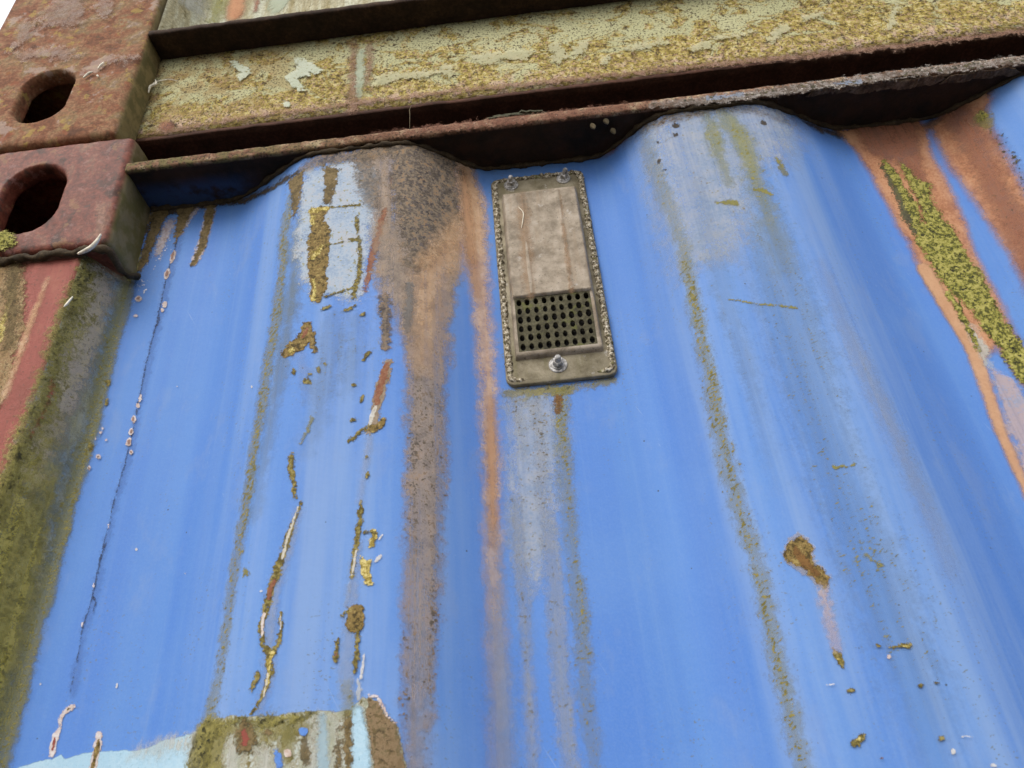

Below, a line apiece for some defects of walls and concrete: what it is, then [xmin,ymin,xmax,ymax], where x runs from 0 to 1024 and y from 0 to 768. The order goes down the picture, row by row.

peeling [230,60,252,81]
peeling [284,57,323,91]
peeling [371,63,459,87]
peeling [471,36,593,65]
peeling [651,55,1024,106]
peeling [287,161,377,316]
corrosion [840,94,1024,493]
corrosion [137,145,500,754]
peeling [347,417,386,443]
leakage [0,276,132,767]
corrosion [783,536,831,618]
peeling [218,694,407,768]